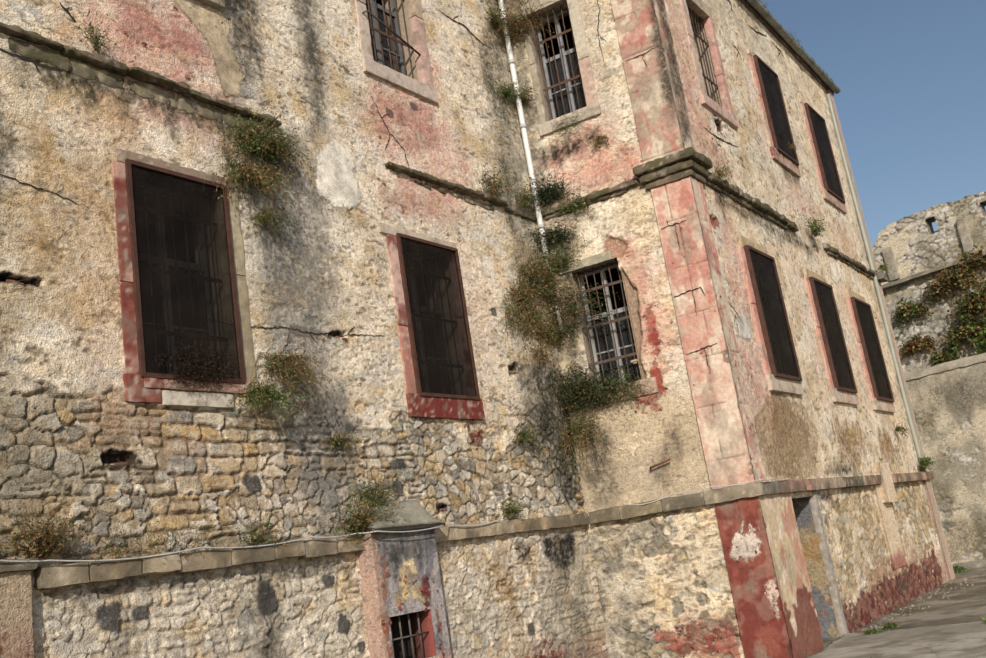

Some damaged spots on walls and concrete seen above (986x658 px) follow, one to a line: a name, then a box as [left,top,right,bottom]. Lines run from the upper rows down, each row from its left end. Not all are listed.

crack [439,10,492,50]
crack [372,98,409,166]
crack [0,174,89,208]
spalling [605,234,631,258]
crack [250,326,383,349]
spalling [618,271,668,456]
peeling [727,523,762,563]
peeling [381,555,445,658]
peeling [764,579,782,620]
peeling [843,549,943,633]
peeling [525,638,567,658]
peeling [651,620,740,658]